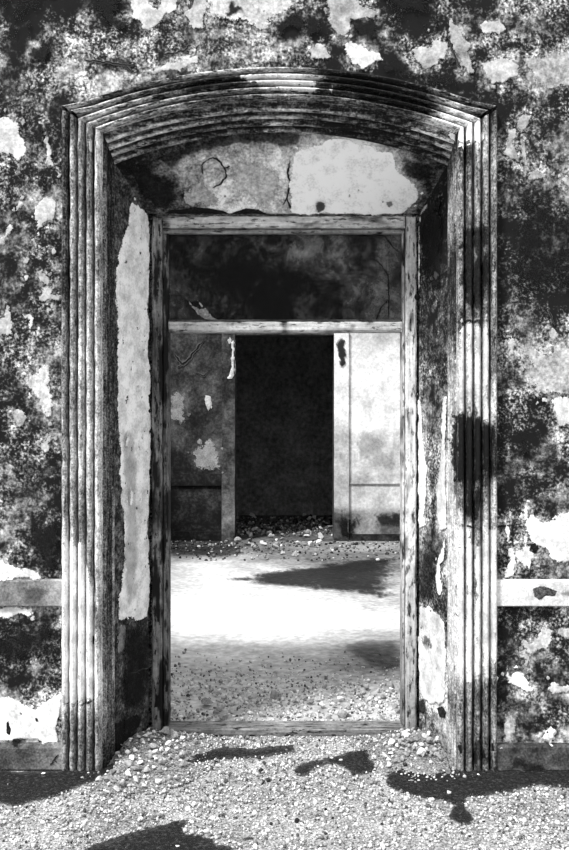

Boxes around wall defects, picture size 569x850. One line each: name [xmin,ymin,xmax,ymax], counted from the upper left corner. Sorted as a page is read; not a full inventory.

peeling [131,0,295,35]
damp [28,45,52,63]
crack [201,157,230,188]
crack [283,163,292,213]
peeling [166,138,427,289]
damp [420,198,442,288]
damp [336,338,346,366]
peeling [115,197,152,654]
damp [19,523,59,571]
damp [419,552,434,601]
peeling [455,500,569,699]
peeling [0,521,101,745]